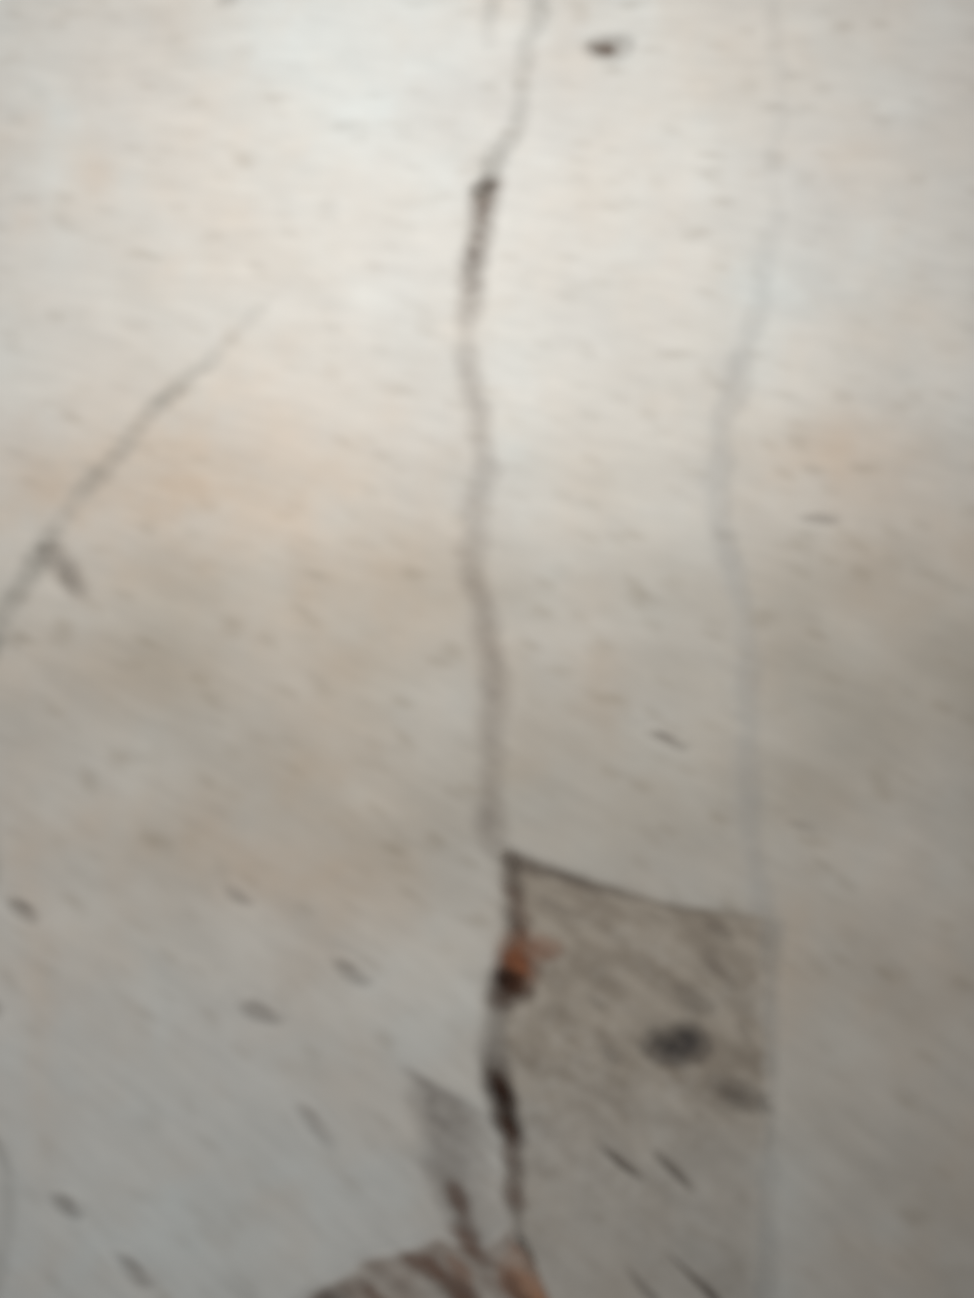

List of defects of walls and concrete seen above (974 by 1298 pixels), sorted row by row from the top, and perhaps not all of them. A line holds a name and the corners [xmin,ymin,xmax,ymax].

crack [0,289,282,662]
crack [447,169,518,864]
flaking render [2,889,46,926]
rust [495,944,538,1001]
flaking render [231,989,289,1028]
flaking render [303,847,782,1298]
flaking render [289,1090,342,1157]
crack [0,1137,20,1298]
flaking render [44,1183,88,1222]
flaking render [107,1241,161,1292]